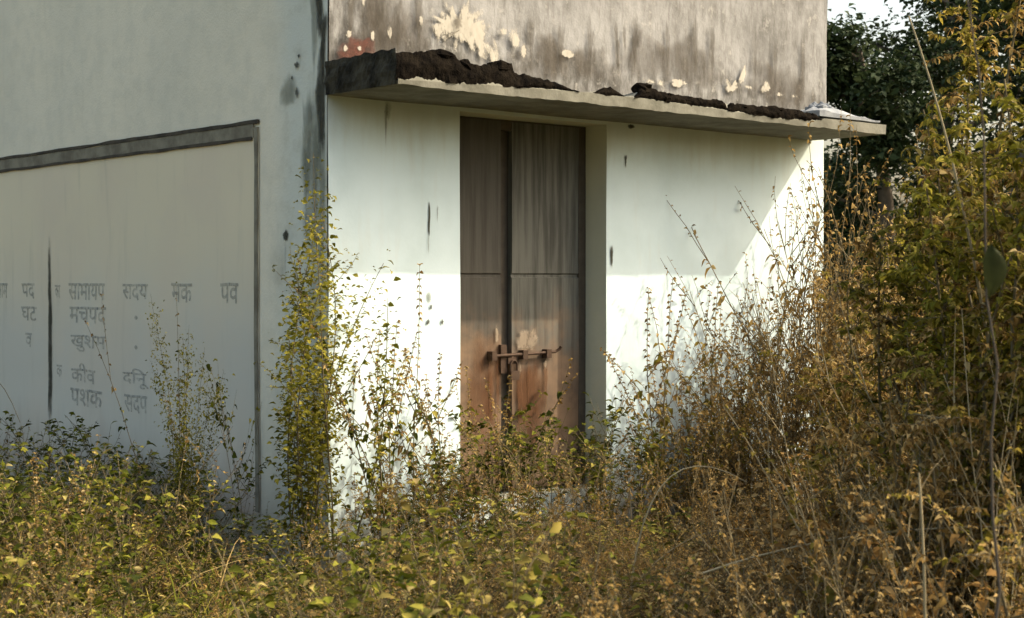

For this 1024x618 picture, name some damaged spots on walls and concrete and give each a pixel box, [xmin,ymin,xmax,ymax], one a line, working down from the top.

damp [305,0,327,167]
spalling [324,0,579,95]
spalling [593,65,822,121]
damp [769,57,804,100]